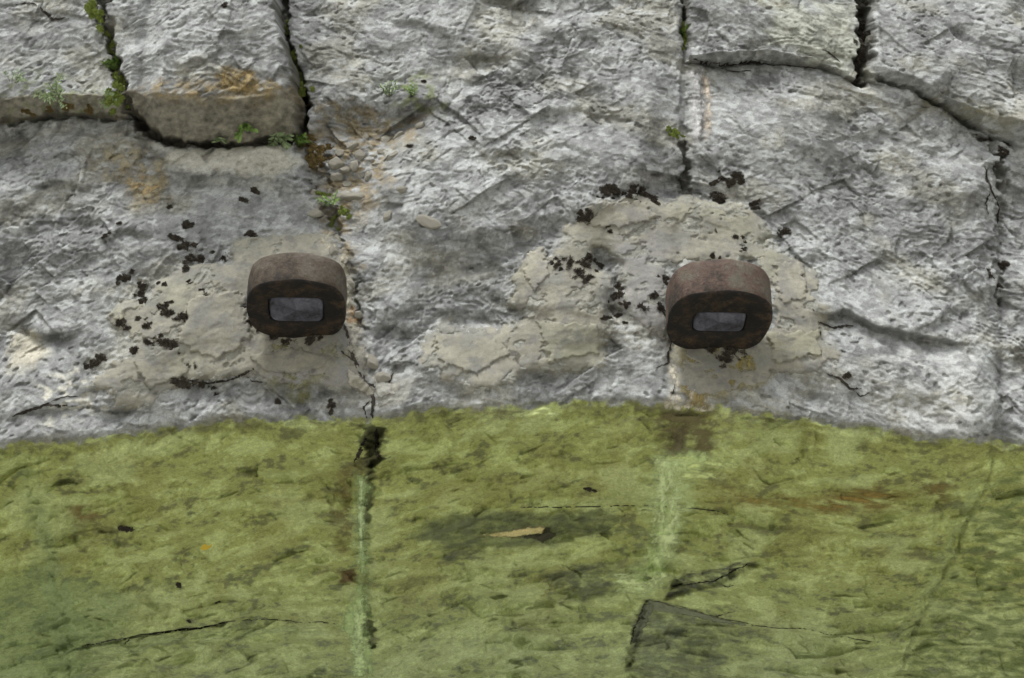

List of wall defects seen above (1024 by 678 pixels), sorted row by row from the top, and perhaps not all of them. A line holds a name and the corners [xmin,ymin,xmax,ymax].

crack [984,166,1000,223]
crack [341,324,394,463]
damp [615,368,736,597]
damp [81,632,227,674]
crack [82,619,335,647]
damp [341,476,372,677]
crack [630,563,871,644]